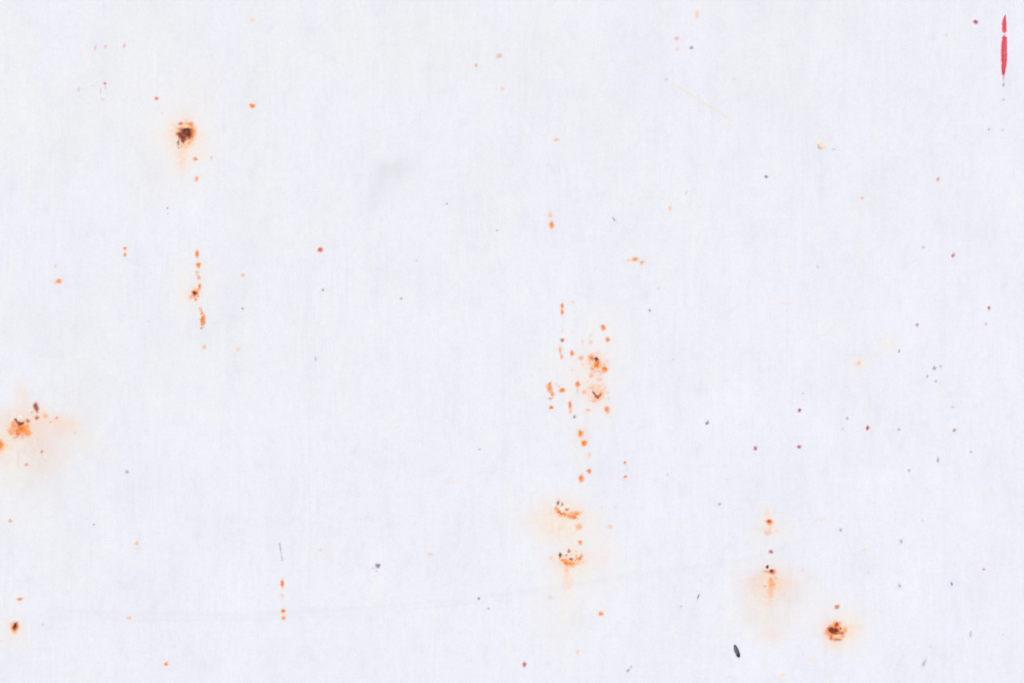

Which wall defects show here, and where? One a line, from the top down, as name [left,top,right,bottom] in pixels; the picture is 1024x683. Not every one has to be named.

rust [0,372,121,537]
rust [520,282,653,483]
rust [696,534,905,681]